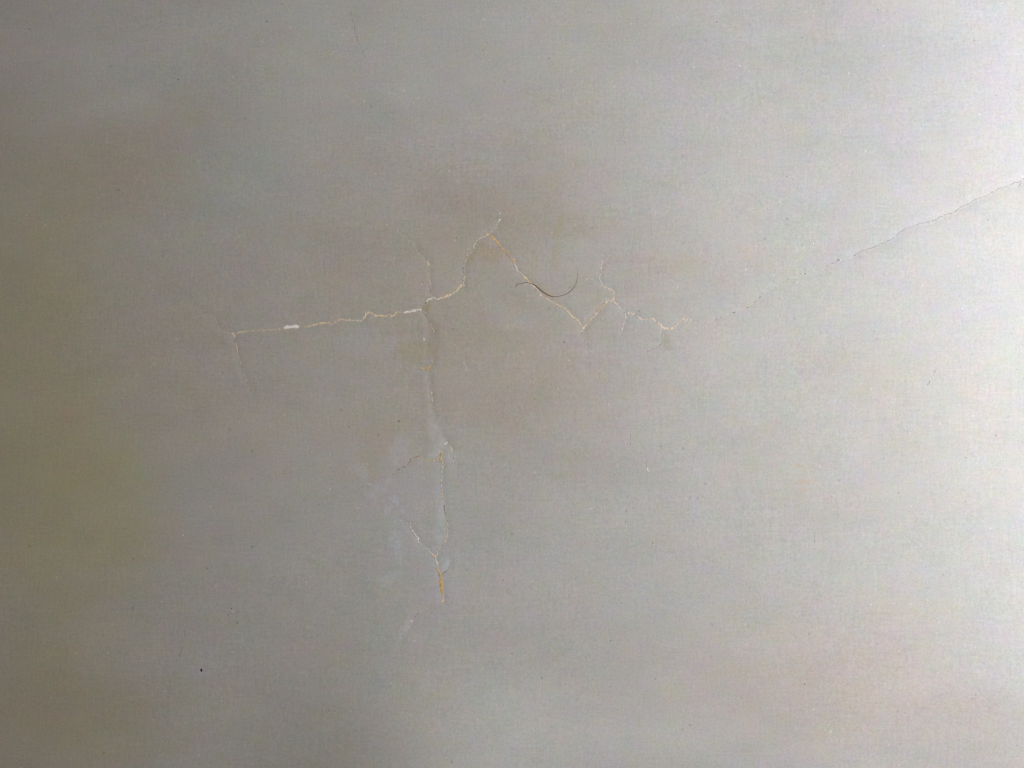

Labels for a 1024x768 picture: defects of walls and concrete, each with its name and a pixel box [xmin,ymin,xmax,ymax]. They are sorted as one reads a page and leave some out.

crack [202,174,1024,392]
crack [393,442,456,649]